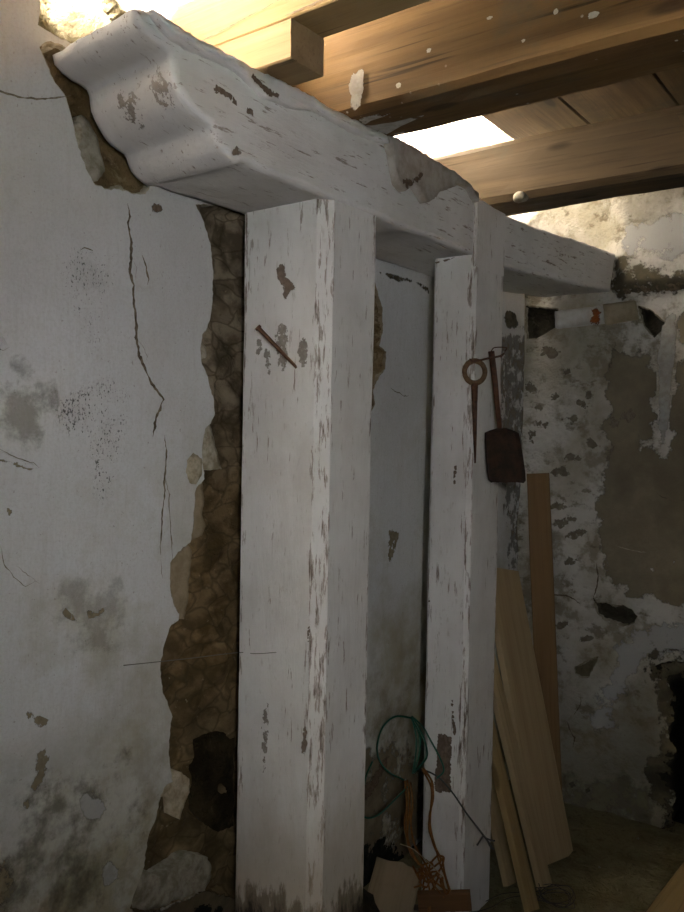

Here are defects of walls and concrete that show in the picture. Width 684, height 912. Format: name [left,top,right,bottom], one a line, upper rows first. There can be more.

crack [0,90,71,100]
spalling [38,0,150,195]
flaking render [146,9,479,204]
crack [127,207,173,579]
peeling [256,324,308,374]
peeling [276,264,295,299]
spalling [371,284,386,410]
spalling [638,305,665,338]
spalling [130,203,245,912]
peeling [551,502,587,540]
peeling [592,348,684,627]
peeling [261,703,269,772]